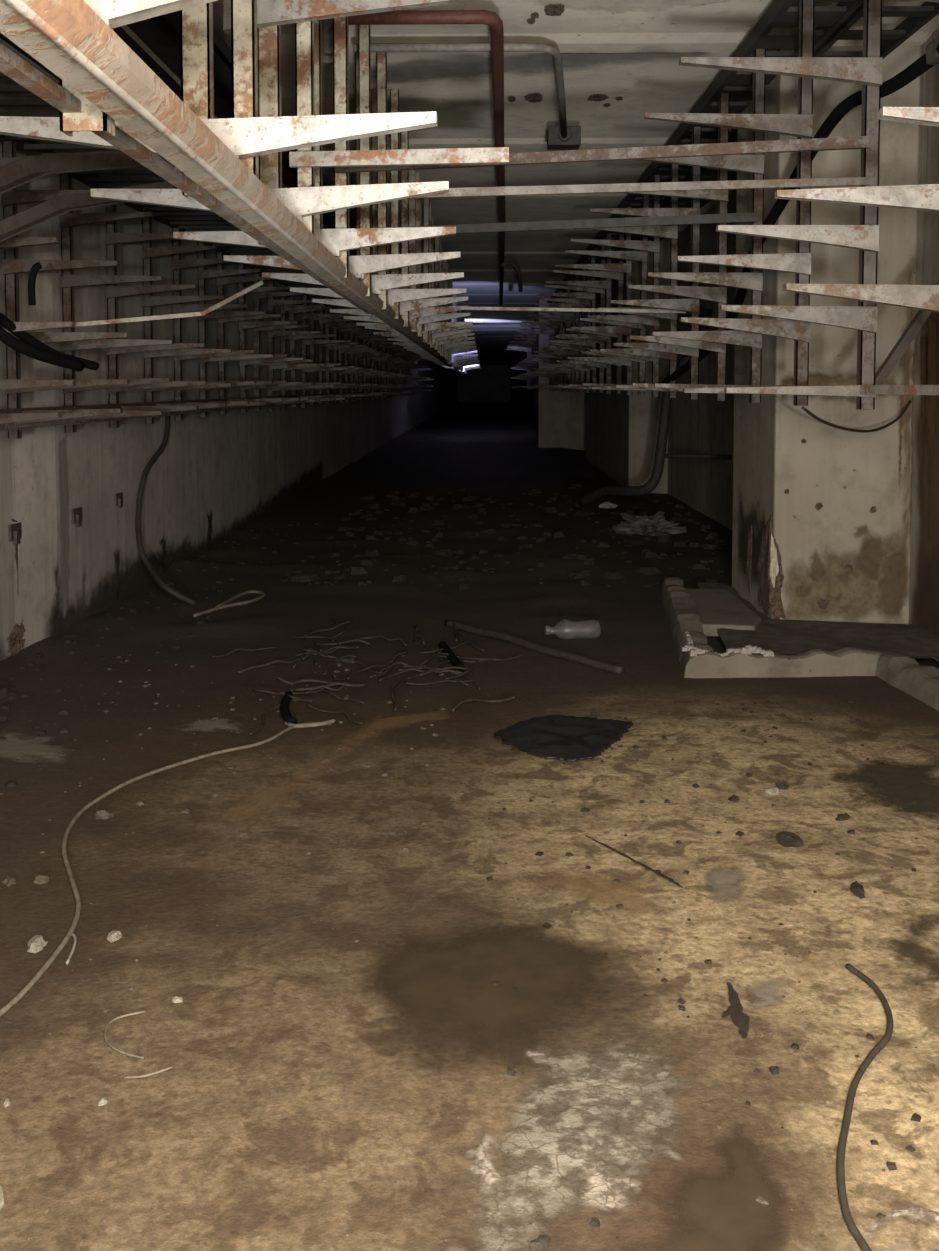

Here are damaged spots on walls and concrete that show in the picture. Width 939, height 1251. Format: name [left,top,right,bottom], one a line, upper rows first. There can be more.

leakage [738,502,765,581]
leakage [787,526,907,620]
leakage [373,924,680,1251]
leakage [657,1140,782,1251]